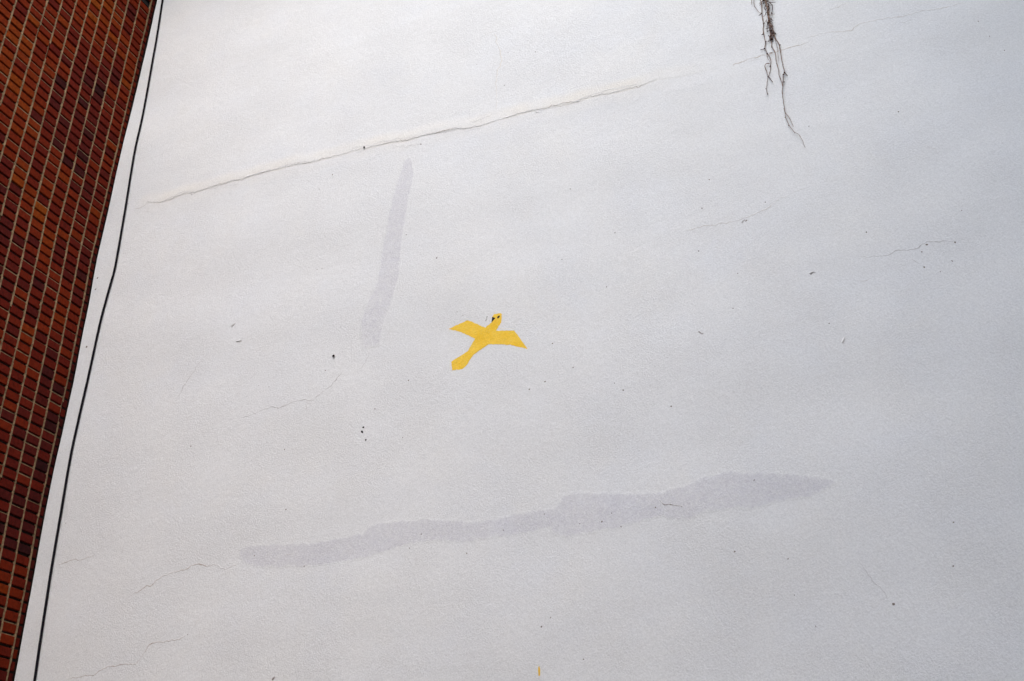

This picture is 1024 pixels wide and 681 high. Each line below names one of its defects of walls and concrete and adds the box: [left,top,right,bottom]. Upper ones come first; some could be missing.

crack [110,80,653,217]
damp [359,156,415,350]
damp [238,468,838,570]